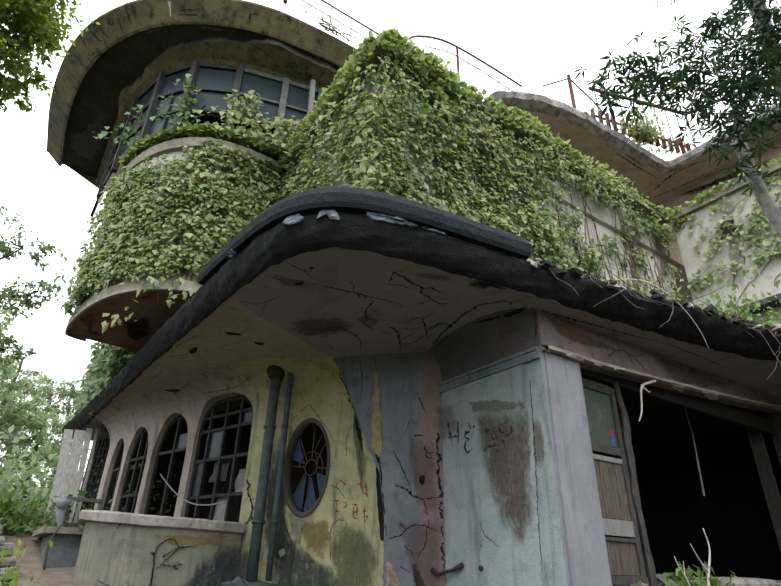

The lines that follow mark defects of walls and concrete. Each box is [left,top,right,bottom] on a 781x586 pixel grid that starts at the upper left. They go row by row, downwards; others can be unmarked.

crack [222,263,729,429]
leakage [265,450,375,586]
leakage [353,407,365,479]
flaking render [354,367,387,540]
leakage [470,400,530,537]